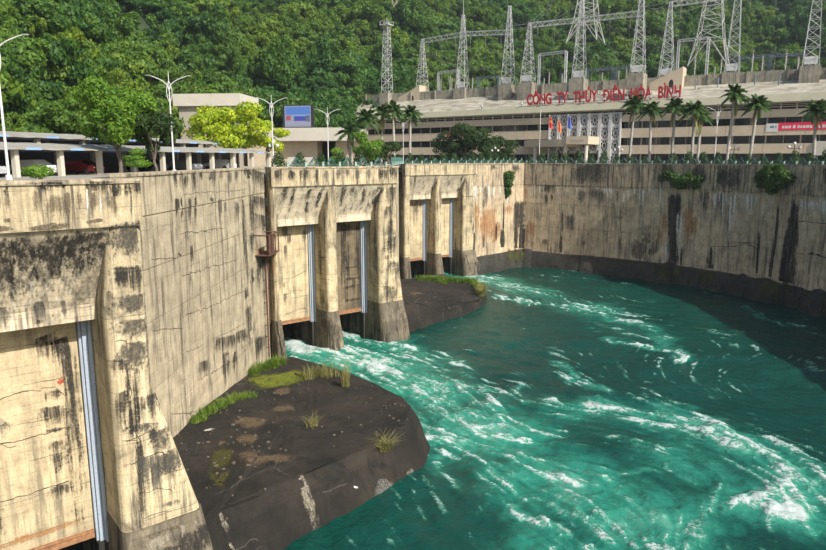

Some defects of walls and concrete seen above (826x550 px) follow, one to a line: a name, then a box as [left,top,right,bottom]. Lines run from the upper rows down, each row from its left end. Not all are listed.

water stain [0,220,140,327]
water stain [34,181,141,215]
water stain [210,196,272,383]
water stain [173,168,400,302]
rust [475,207,500,241]
water stain [495,164,612,263]
water stain [623,164,682,282]
water stain [700,166,826,306]
crack [0,427,68,448]
crack [0,481,69,510]
water stain [35,333,84,494]
water stain [108,265,211,518]